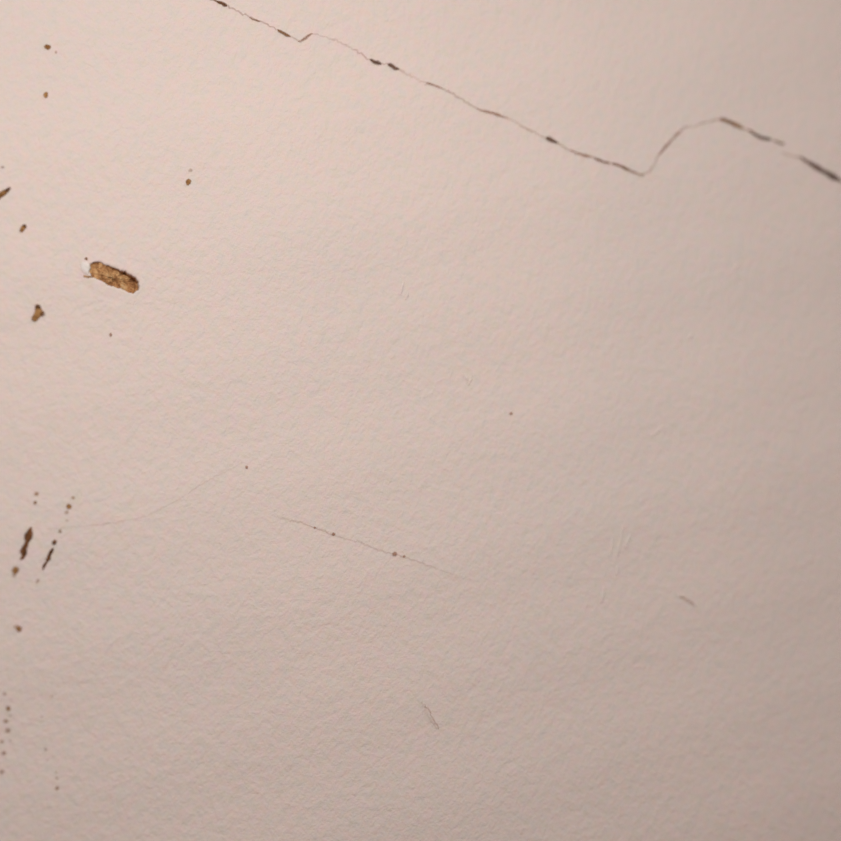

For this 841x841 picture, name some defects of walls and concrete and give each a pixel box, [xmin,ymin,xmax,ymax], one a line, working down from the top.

crack [370,59,399,70]
crack [719,118,785,144]
crack [546,137,643,175]
crack [801,157,840,182]
spalling [78,251,150,304]
peeling [32,305,43,321]